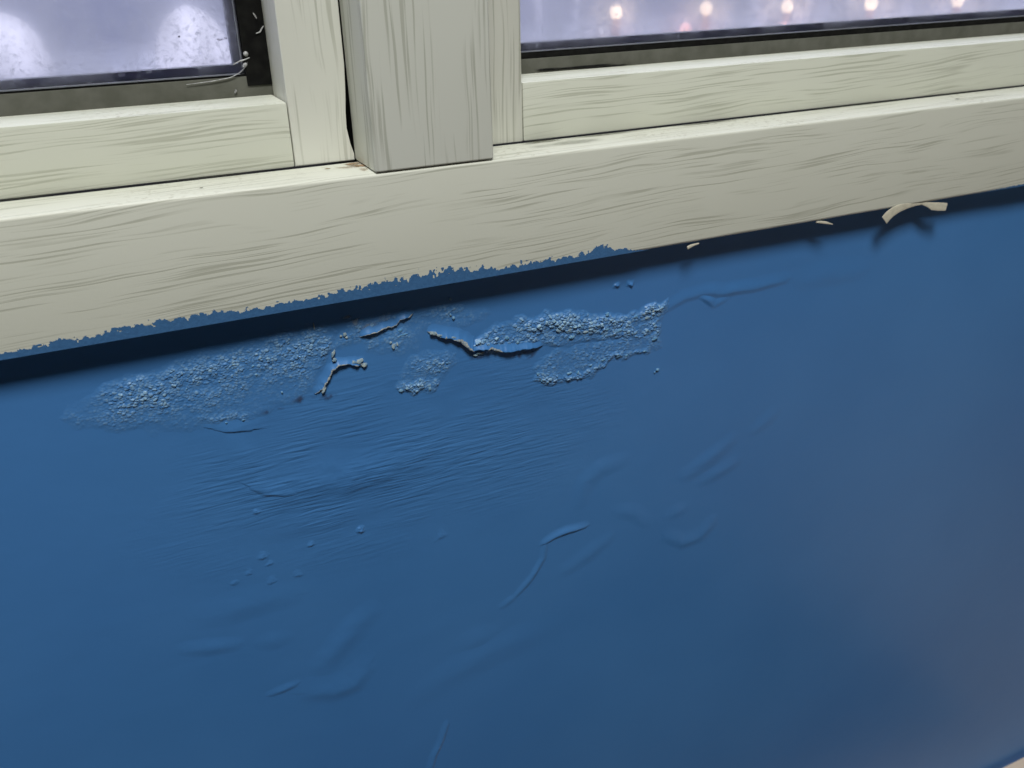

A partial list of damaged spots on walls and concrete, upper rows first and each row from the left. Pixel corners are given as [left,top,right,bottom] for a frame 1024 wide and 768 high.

peeling [340,305,414,349]
peeling [427,313,543,356]
peeling [312,349,367,394]